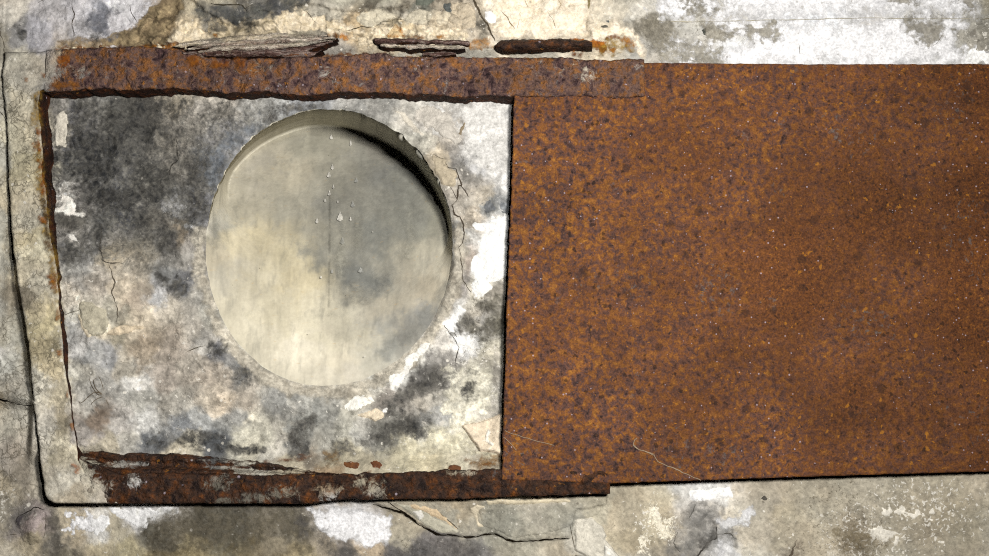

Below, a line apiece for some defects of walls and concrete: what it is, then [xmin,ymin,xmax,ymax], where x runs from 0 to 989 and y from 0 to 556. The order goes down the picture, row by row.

rust [571,35,635,57]
damp [634,18,674,49]
damp [437,102,514,186]
mould [482,200,510,213]
crack [99,224,120,322]
mould [451,294,507,341]
damp [415,361,499,459]
crack [0,382,117,538]
rust [323,450,382,473]
rust [448,455,499,470]
crack [373,503,577,556]
damp [667,501,756,556]